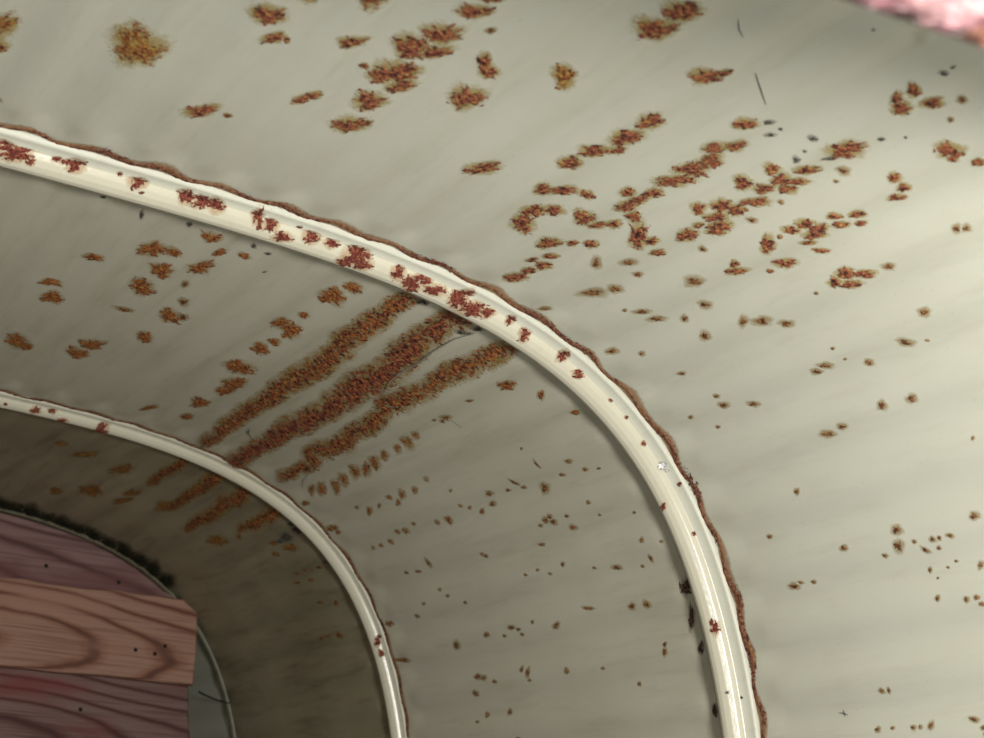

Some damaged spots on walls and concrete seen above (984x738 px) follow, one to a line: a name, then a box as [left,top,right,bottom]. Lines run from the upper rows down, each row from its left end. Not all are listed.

rust [0,10,19,53]
rust [109,21,169,68]
rust [249,4,290,44]
rust [331,0,501,135]
rust [551,63,578,91]
rust [184,104,232,119]
rust [292,91,323,104]
rust [826,140,868,183]
rust [676,163,823,252]
rust [828,263,894,289]
rust [739,316,794,327]
rust [882,525,954,558]